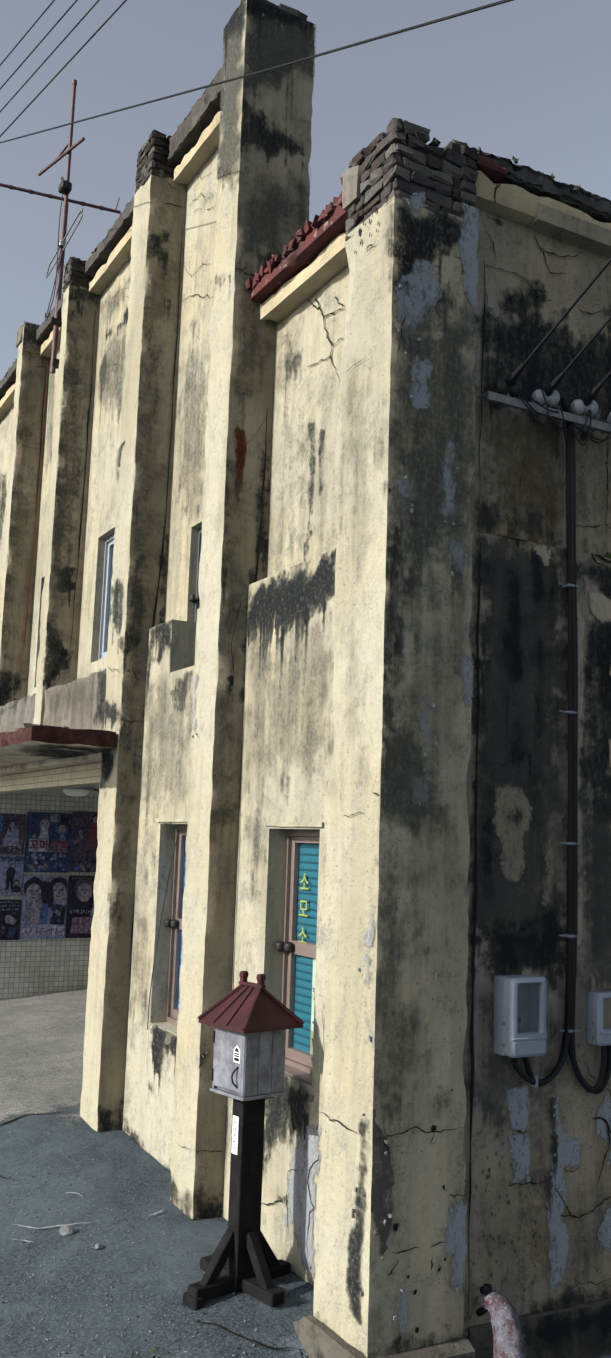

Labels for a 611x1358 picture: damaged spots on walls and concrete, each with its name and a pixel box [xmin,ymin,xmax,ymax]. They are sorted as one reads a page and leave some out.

damp [215,0,316,424]
peeling [457,203,503,309]
crack [308,296,363,381]
peeling [396,259,441,411]
damp [178,351,205,512]
rust [234,426,246,502]
damp [217,422,336,787]
damp [375,195,611,1211]
peeling [279,1124,322,1272]
peeling [438,1202,475,1290]
peeling [482,1085,611,1292]
damp [387,1333,450,1358]